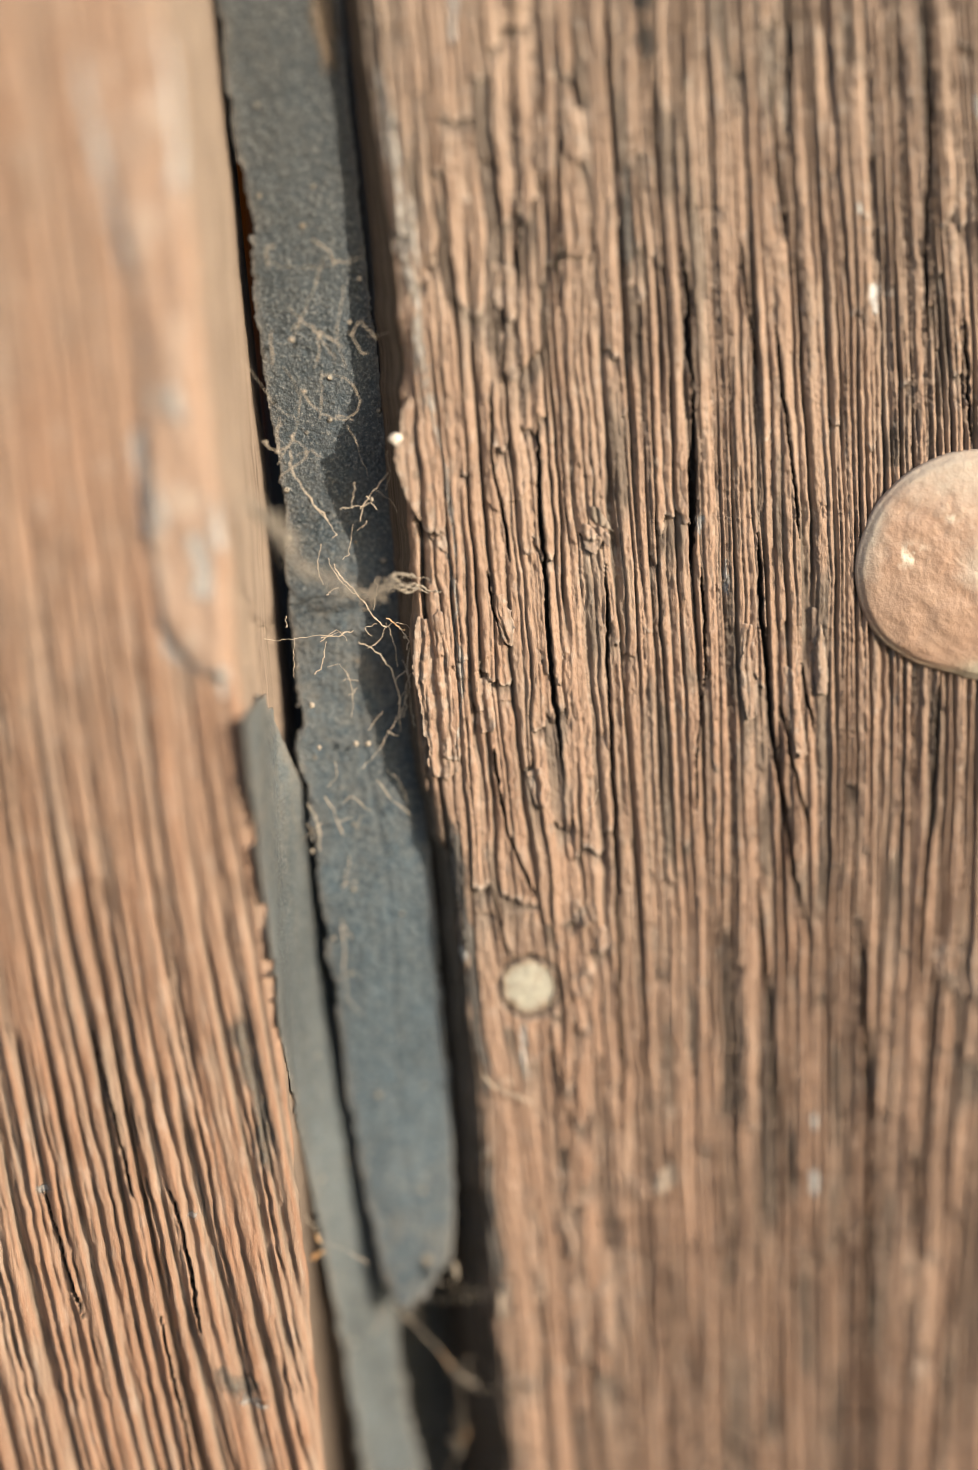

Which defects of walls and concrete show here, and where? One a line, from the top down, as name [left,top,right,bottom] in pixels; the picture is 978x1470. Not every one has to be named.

peeling [393,396,449,554]
peeling [412,609,458,780]
peeling [476,676,496,733]
peeling [493,594,515,647]
peeling [490,262,521,380]
crack [486,385,563,763]
peeling [582,506,613,555]
crack [605,586,624,1115]
crack [681,255,707,803]
crack [739,246,799,530]
crack [757,544,814,1158]
crack [916,688,939,993]